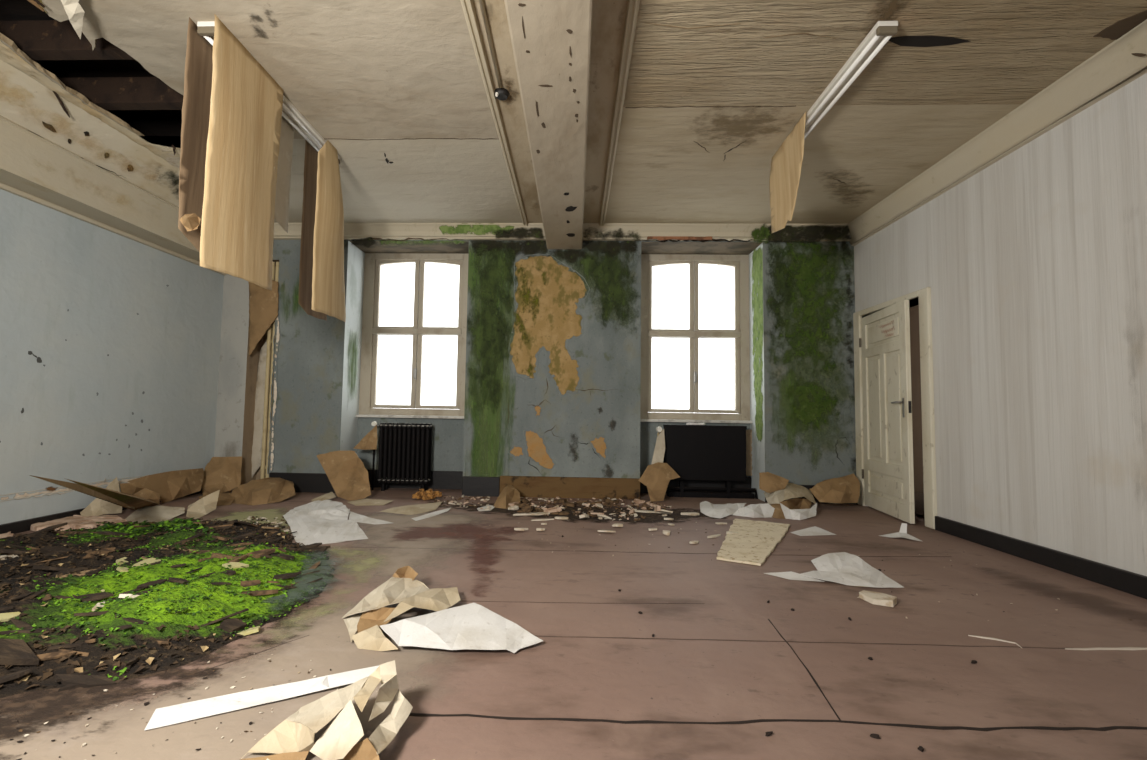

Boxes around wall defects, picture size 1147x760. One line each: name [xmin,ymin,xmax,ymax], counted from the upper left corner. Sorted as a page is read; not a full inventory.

flaking render [61,0,85,39]
flaking render [0,40,181,169]
water stain [767,224,851,255]
peeling [509,254,590,397]
peeling [508,403,556,470]